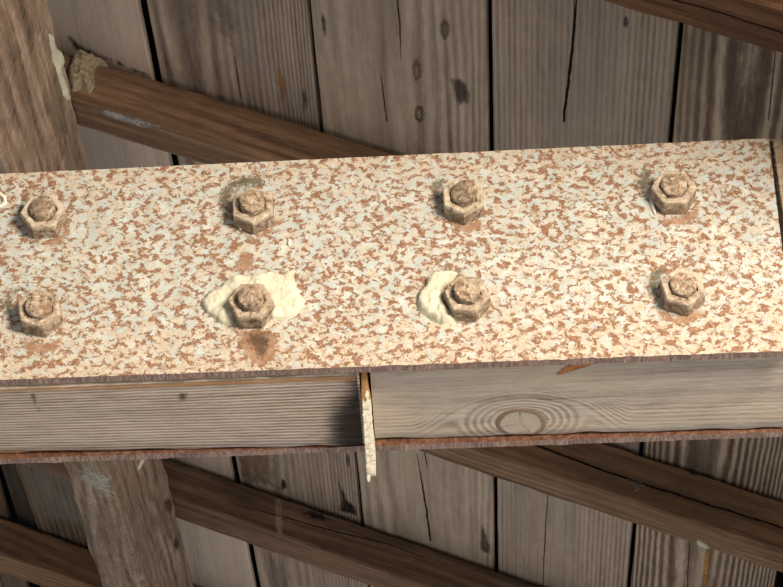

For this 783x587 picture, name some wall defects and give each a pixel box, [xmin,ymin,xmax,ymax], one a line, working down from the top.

crack [395,0,403,56]
crack [672,0,783,33]
crack [563,0,577,122]
crack [768,51,776,121]
corrosion [770,141,783,251]
corrosion [237,253,254,271]
corrosion [21,338,59,355]
corrosion [238,330,279,365]
leakage [240,455,286,489]
crack [507,412,783,529]
crack [232,452,431,559]